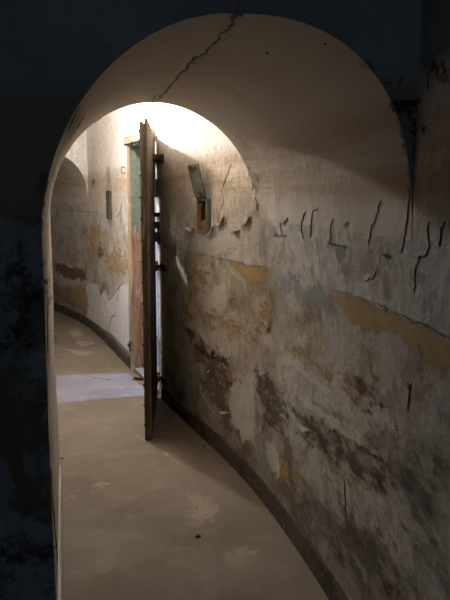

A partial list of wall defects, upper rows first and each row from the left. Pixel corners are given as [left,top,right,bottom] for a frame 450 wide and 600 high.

crack [151,0,246,103]
crack [217,165,230,221]
peeling [184,207,269,285]
crack [300,206,318,239]
crack [328,219,348,243]
crack [368,201,381,244]
crack [396,186,445,292]
peeling [53,258,129,351]
peeling [274,273,450,371]